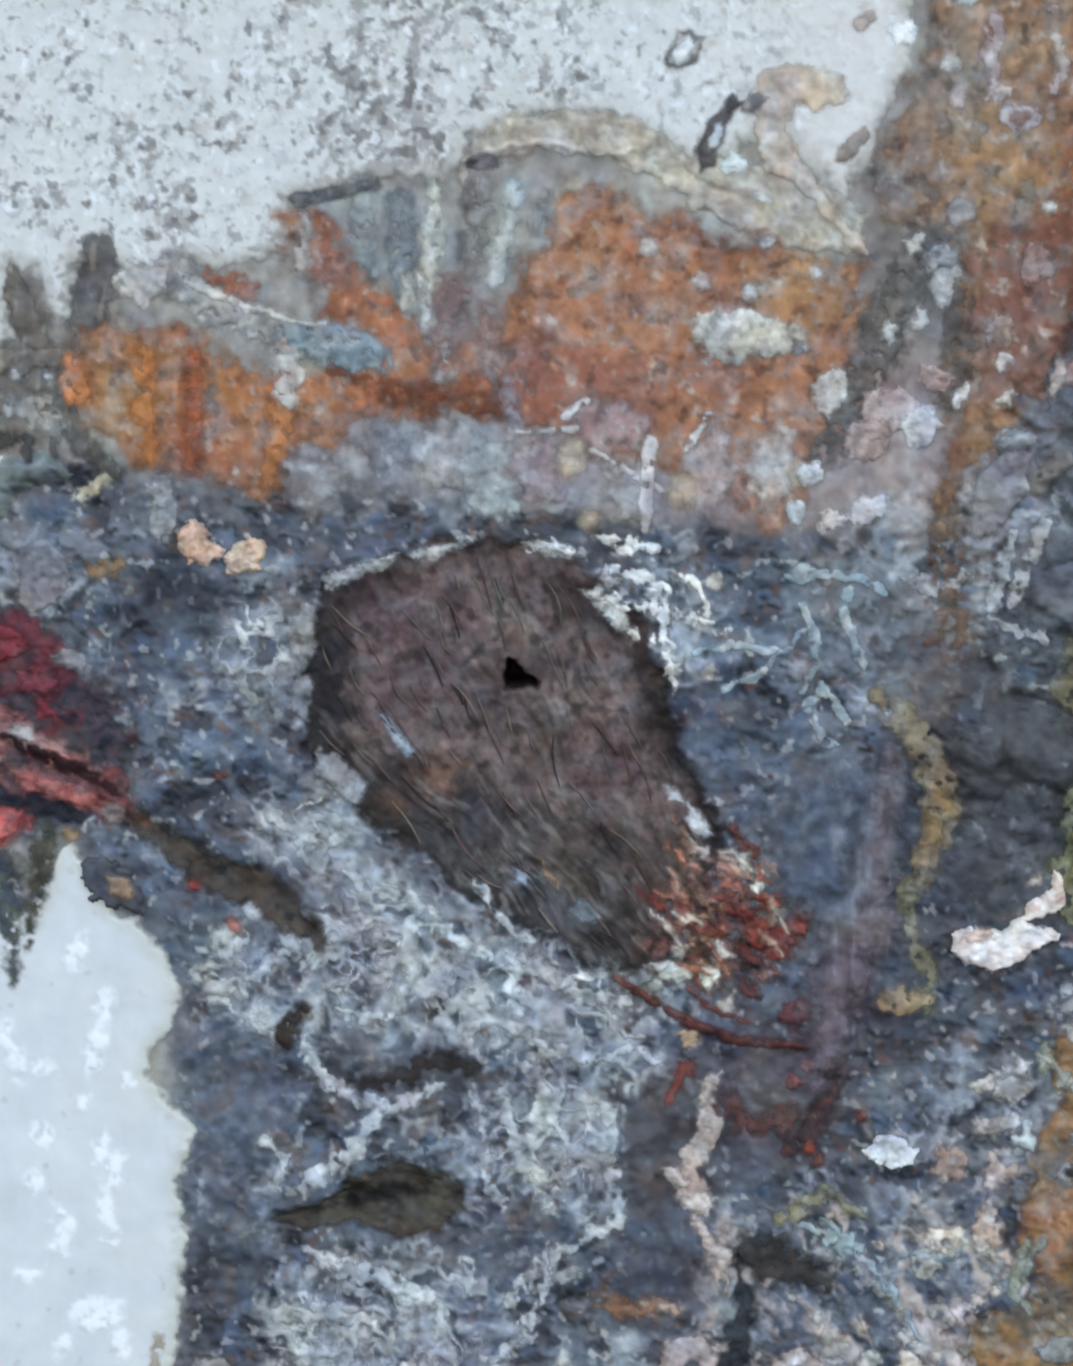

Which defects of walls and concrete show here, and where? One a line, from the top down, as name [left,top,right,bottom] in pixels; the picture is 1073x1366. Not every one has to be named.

peeling [665,30,704,68]
peeling [854,10,876,31]
peeling [112,261,168,310]
corrosion [58,182,867,534]
peeling [287,63,869,451]
spalling [786,224,1018,532]
corrosion [870,0,1073,538]
spalling [1020,242,1057,287]
corrosion [80,854,146,916]
spalling [287,520,814,1000]
corrosion [971,982,1073,1366]